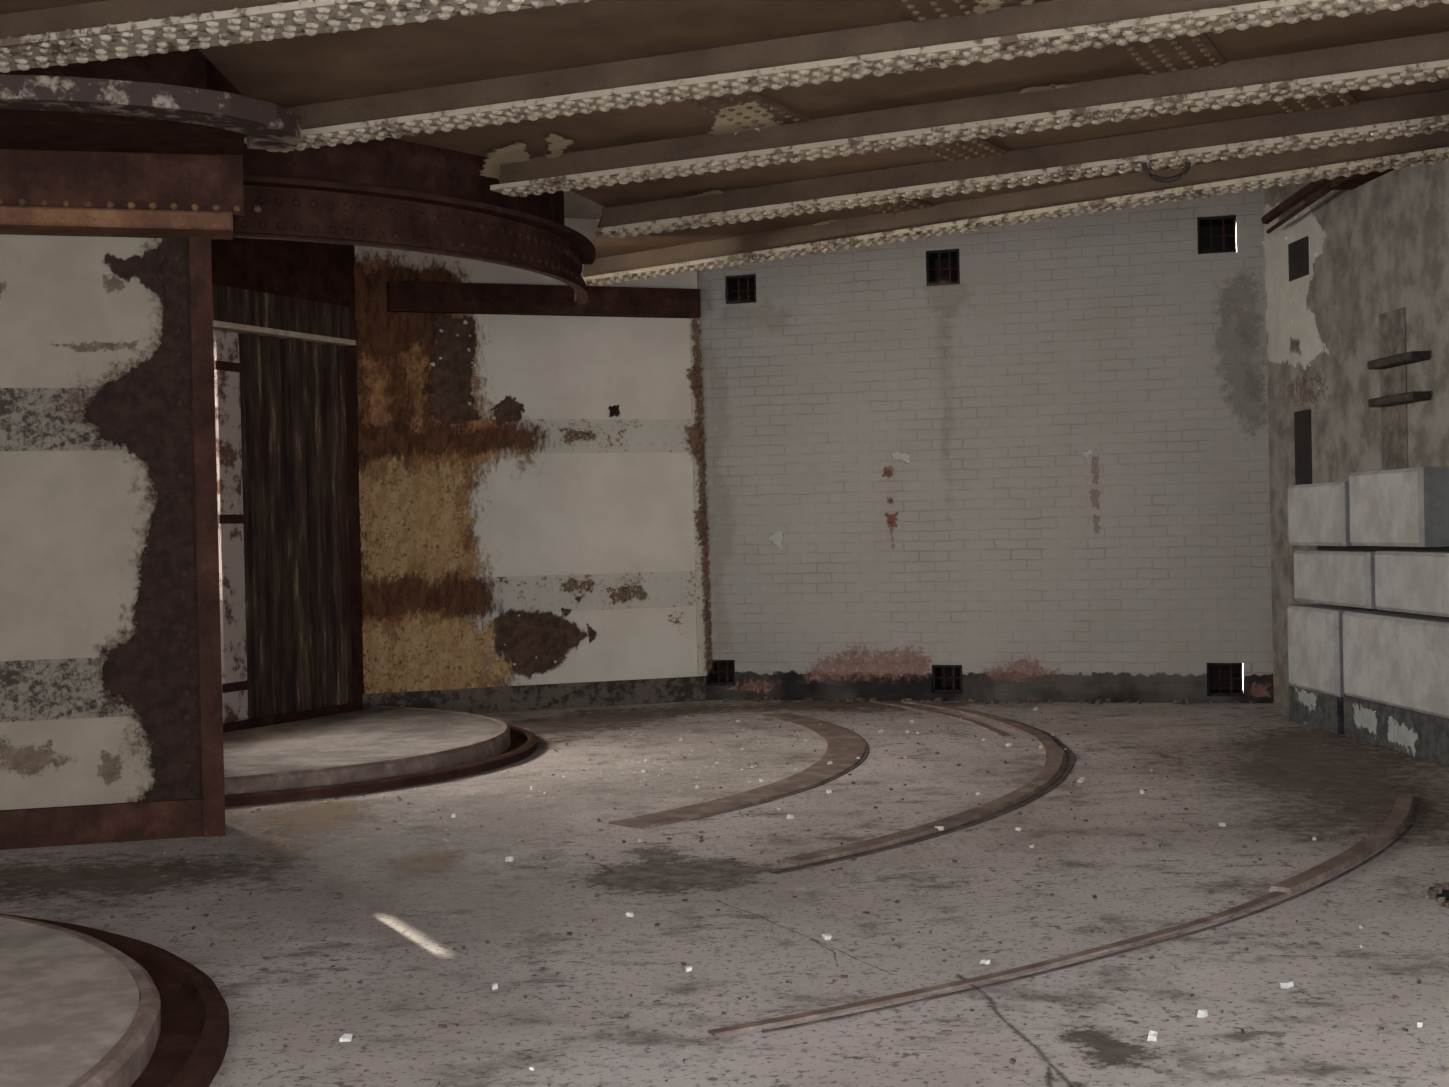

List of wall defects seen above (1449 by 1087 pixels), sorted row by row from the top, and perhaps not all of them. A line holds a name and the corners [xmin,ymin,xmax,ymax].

peeling [971,0,1034,14]
peeling [427,315,525,425]
peeling [488,594,597,679]
crack [957,975,1074,1087]